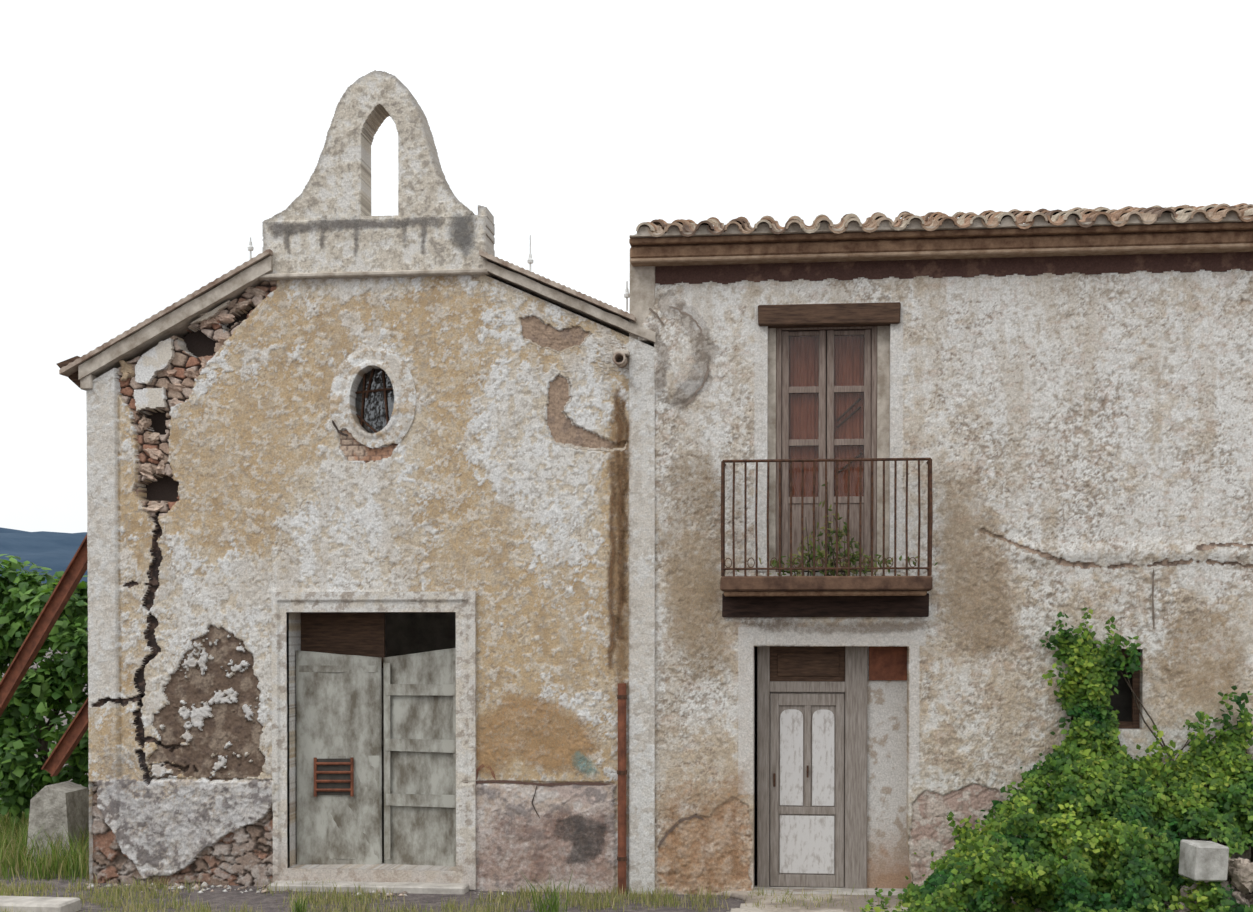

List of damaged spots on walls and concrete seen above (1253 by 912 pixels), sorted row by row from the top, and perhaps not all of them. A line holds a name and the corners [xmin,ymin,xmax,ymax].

peeling [520,316,591,353]
peeling [546,374,628,452]
crack [92,281,277,786]
leakage [608,390,629,683]
crack [980,528,1253,628]
peeling [147,625,265,781]
flaking render [91,782,273,887]